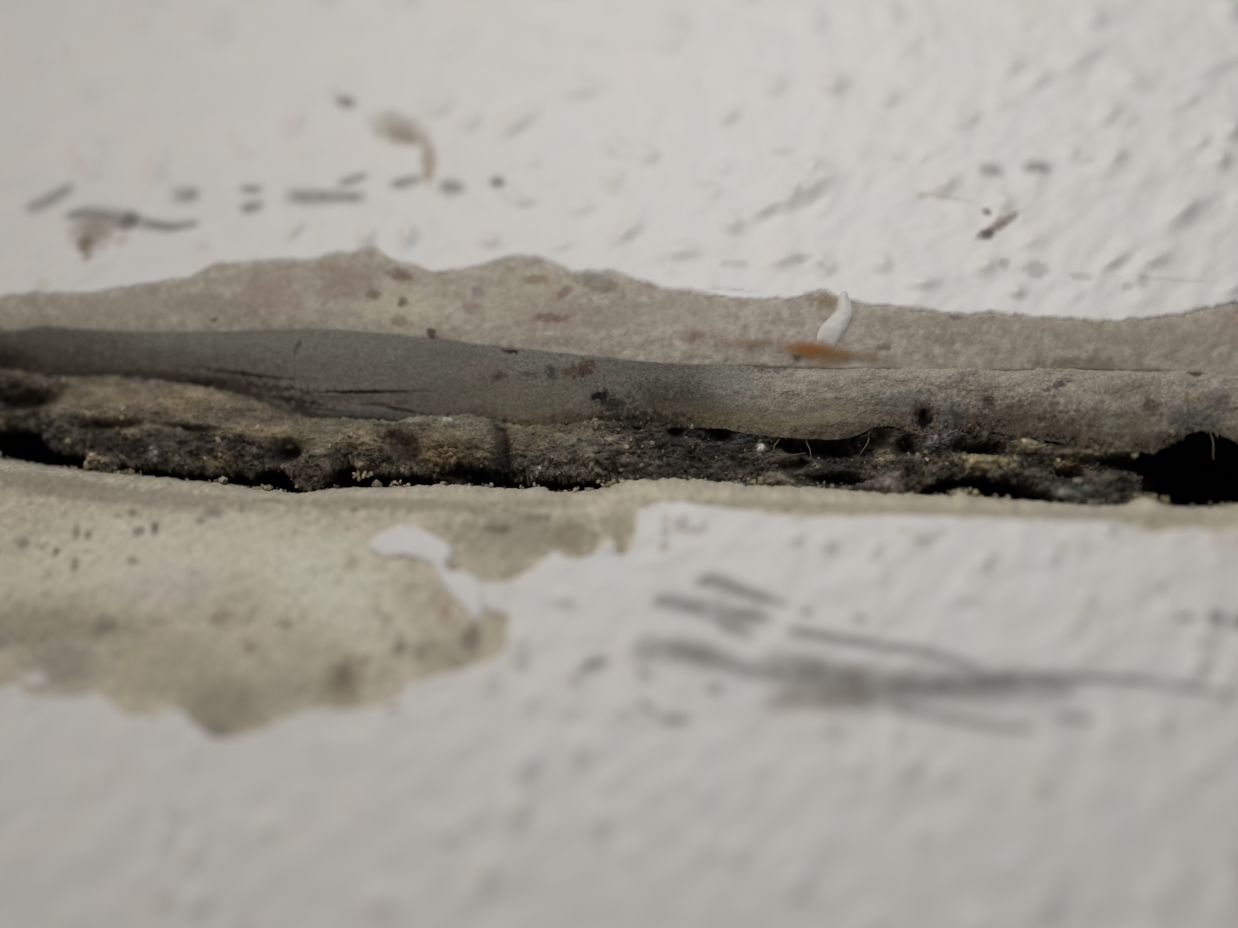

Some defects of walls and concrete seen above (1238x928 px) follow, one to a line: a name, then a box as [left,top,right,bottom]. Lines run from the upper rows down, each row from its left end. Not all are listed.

spalling [0,250,1238,375]
crack [0,326,1238,508]
rust [793,346,836,359]
spalling [0,458,1238,740]